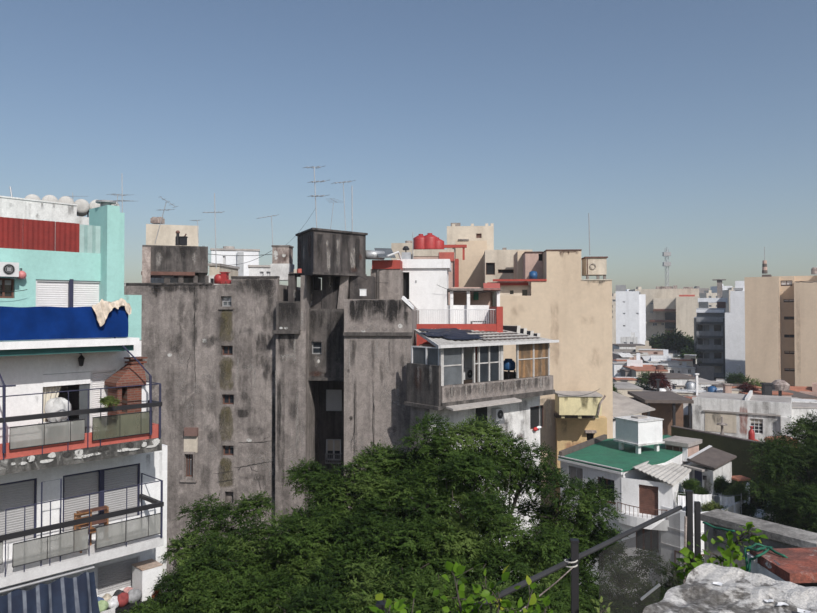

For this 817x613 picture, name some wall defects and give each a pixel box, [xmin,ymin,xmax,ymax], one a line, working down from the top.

damp [318,234,360,282]
damp [350,300,408,323]
crack [187,286,196,391]
damp [220,407,248,440]
peeling [11,438,160,465]